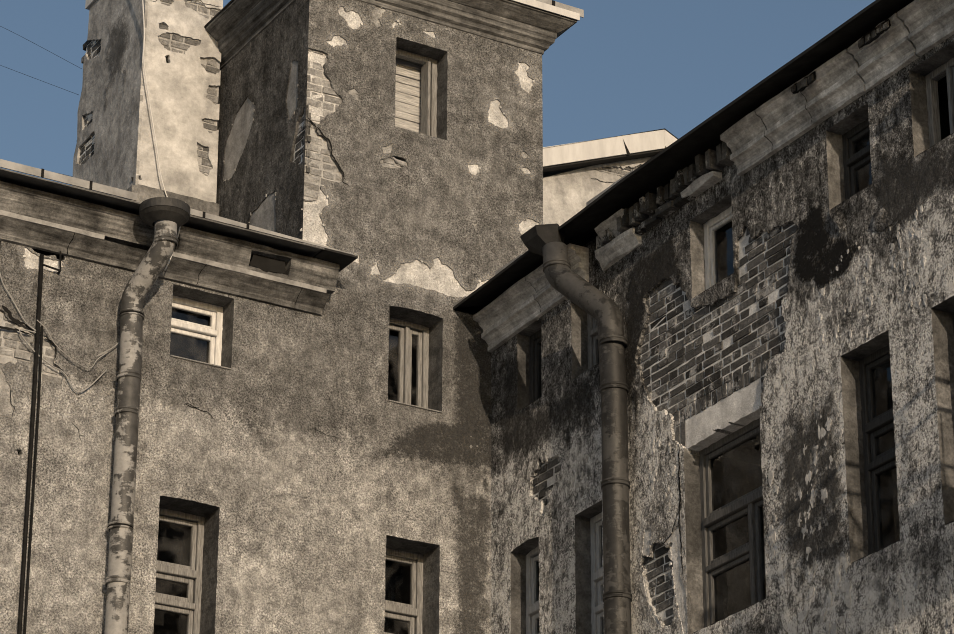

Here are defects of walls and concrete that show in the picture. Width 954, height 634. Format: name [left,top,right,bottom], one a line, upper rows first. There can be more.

flaking render [158,24,201,54]
peeling [338,6,401,29]
peeling [223,97,255,181]
flaking render [286,36,359,248]
crack [308,118,349,186]
peeling [370,257,488,298]
peeling [519,219,539,235]
water stain [793,205,856,289]
flaking render [0,311,62,416]
flaking render [637,222,798,454]
peeling [792,408,851,634]
flaking render [643,526,692,634]